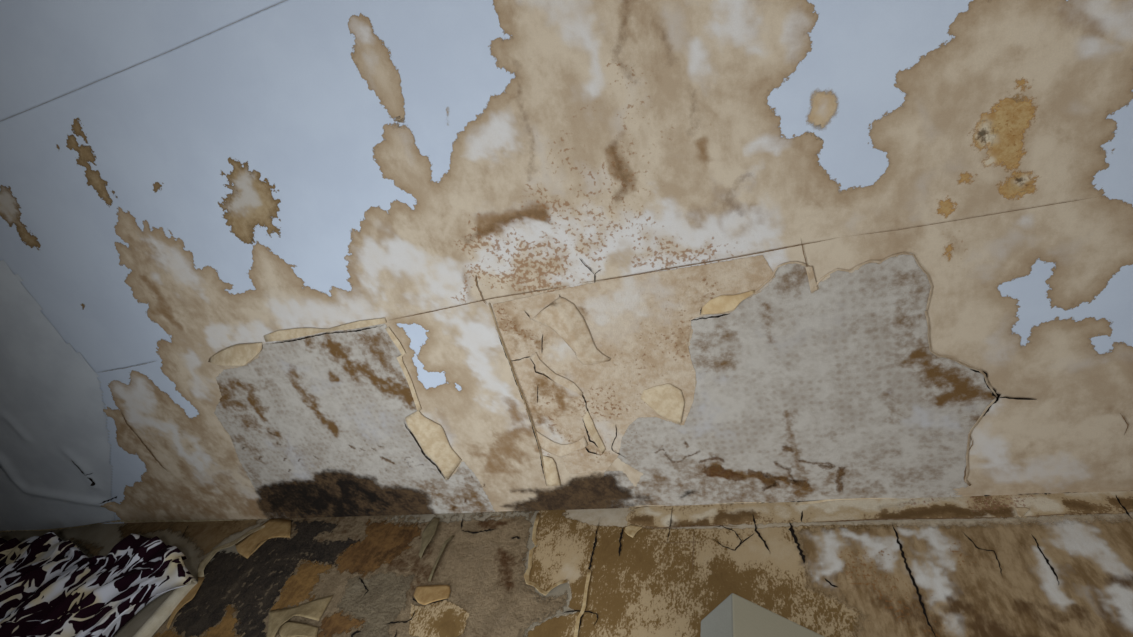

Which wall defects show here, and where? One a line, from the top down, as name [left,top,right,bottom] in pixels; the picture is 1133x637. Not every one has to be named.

damp [56,118,118,207]
damp [0,185,41,250]
damp [100,0,1133,557]
peeling [604,252,997,508]
peeling [152,318,568,637]
damp [271,519,422,610]
crack [588,506,647,570]
peeling [624,524,643,538]
crack [714,501,837,587]
damp [504,454,1133,637]
crack [892,523,936,637]
crack [1032,535,1059,585]